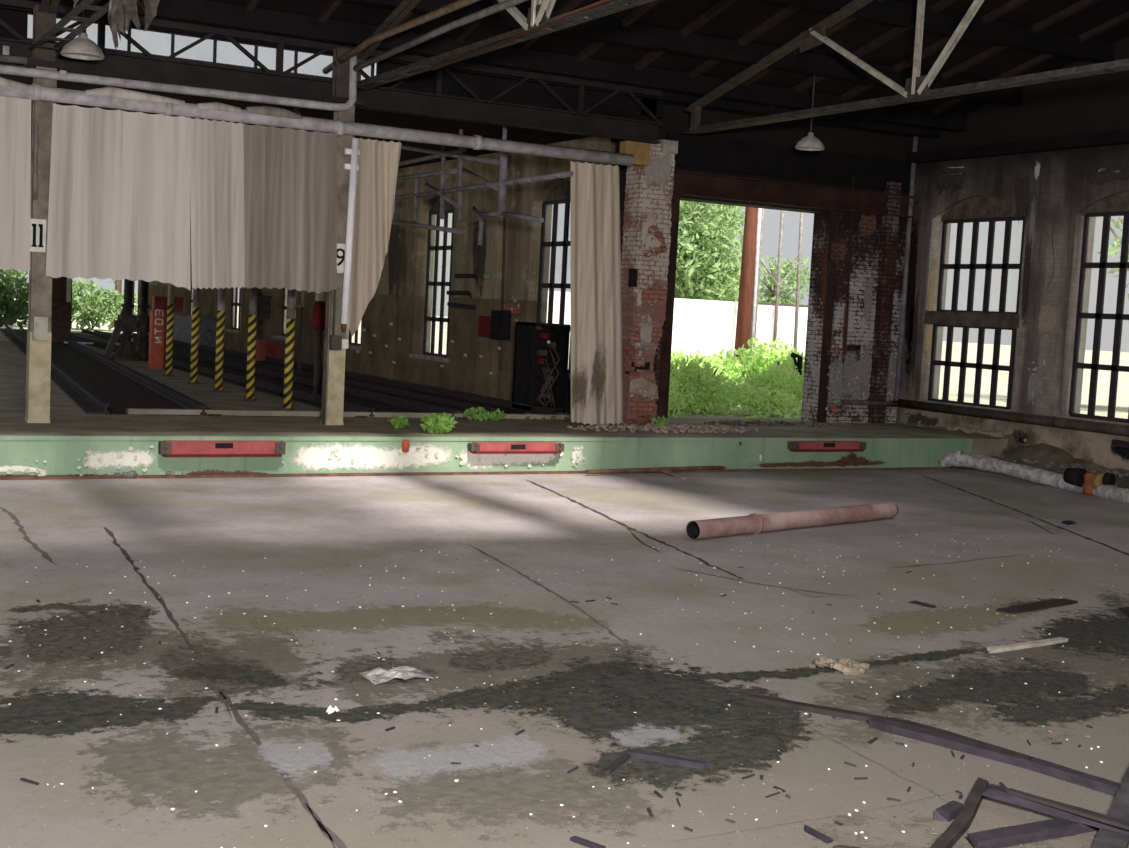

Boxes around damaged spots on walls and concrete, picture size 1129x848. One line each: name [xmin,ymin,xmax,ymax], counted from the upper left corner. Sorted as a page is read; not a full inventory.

spalling [859,214,877,240]
spalling [623,286,666,376]
crack [0,507,58,566]
crack [104,527,347,848]
leakage [0,591,1129,841]
leakage [952,831,973,848]